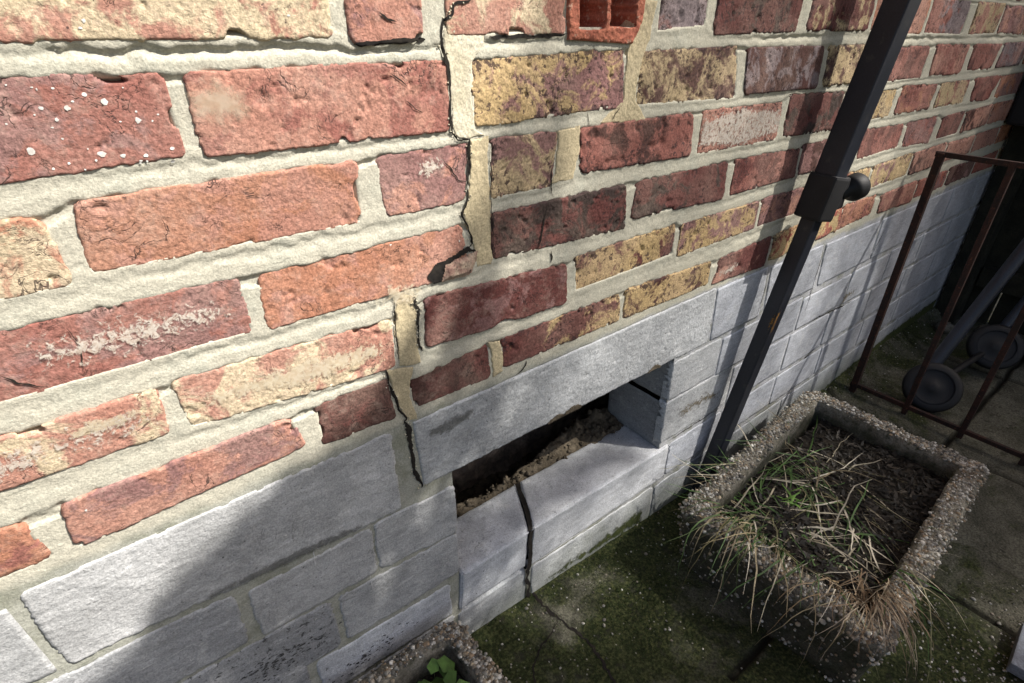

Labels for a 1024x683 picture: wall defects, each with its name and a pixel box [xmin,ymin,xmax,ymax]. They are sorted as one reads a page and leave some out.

crack [438,0,494,247]
spalling [428,246,478,284]
leakage [26,301,233,372]
crack [384,293,427,489]
spalling [628,380,660,400]
spalling [452,392,609,496]
crack [515,482,616,683]